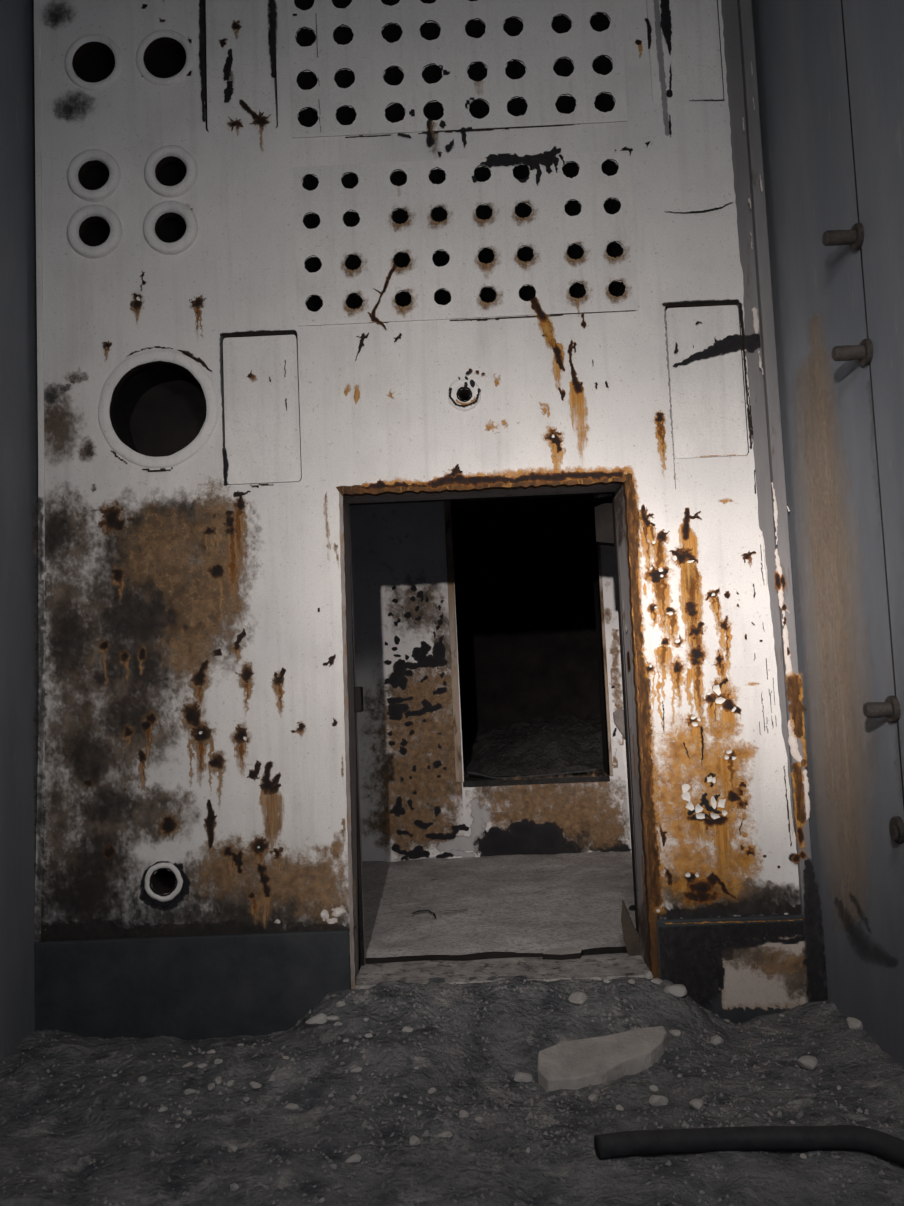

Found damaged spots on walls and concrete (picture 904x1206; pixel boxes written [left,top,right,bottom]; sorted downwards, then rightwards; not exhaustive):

rust [189,294,207,331]
crack [344,264,397,403]
damp [80,441,95,461]
rust [72,330,296,925]
rust [354,402,803,924]
rust [330,818,346,860]
peeling [383,585,653,970]